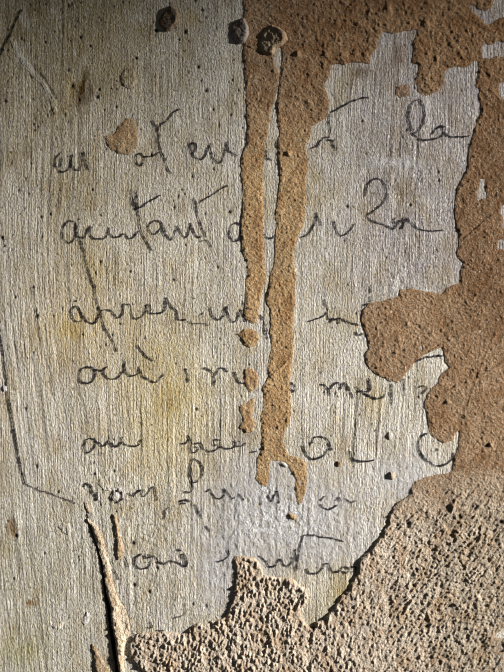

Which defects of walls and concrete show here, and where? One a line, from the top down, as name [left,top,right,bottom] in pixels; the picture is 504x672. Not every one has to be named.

peeling [105,118,139,154]
peeling [129,0,504,672]